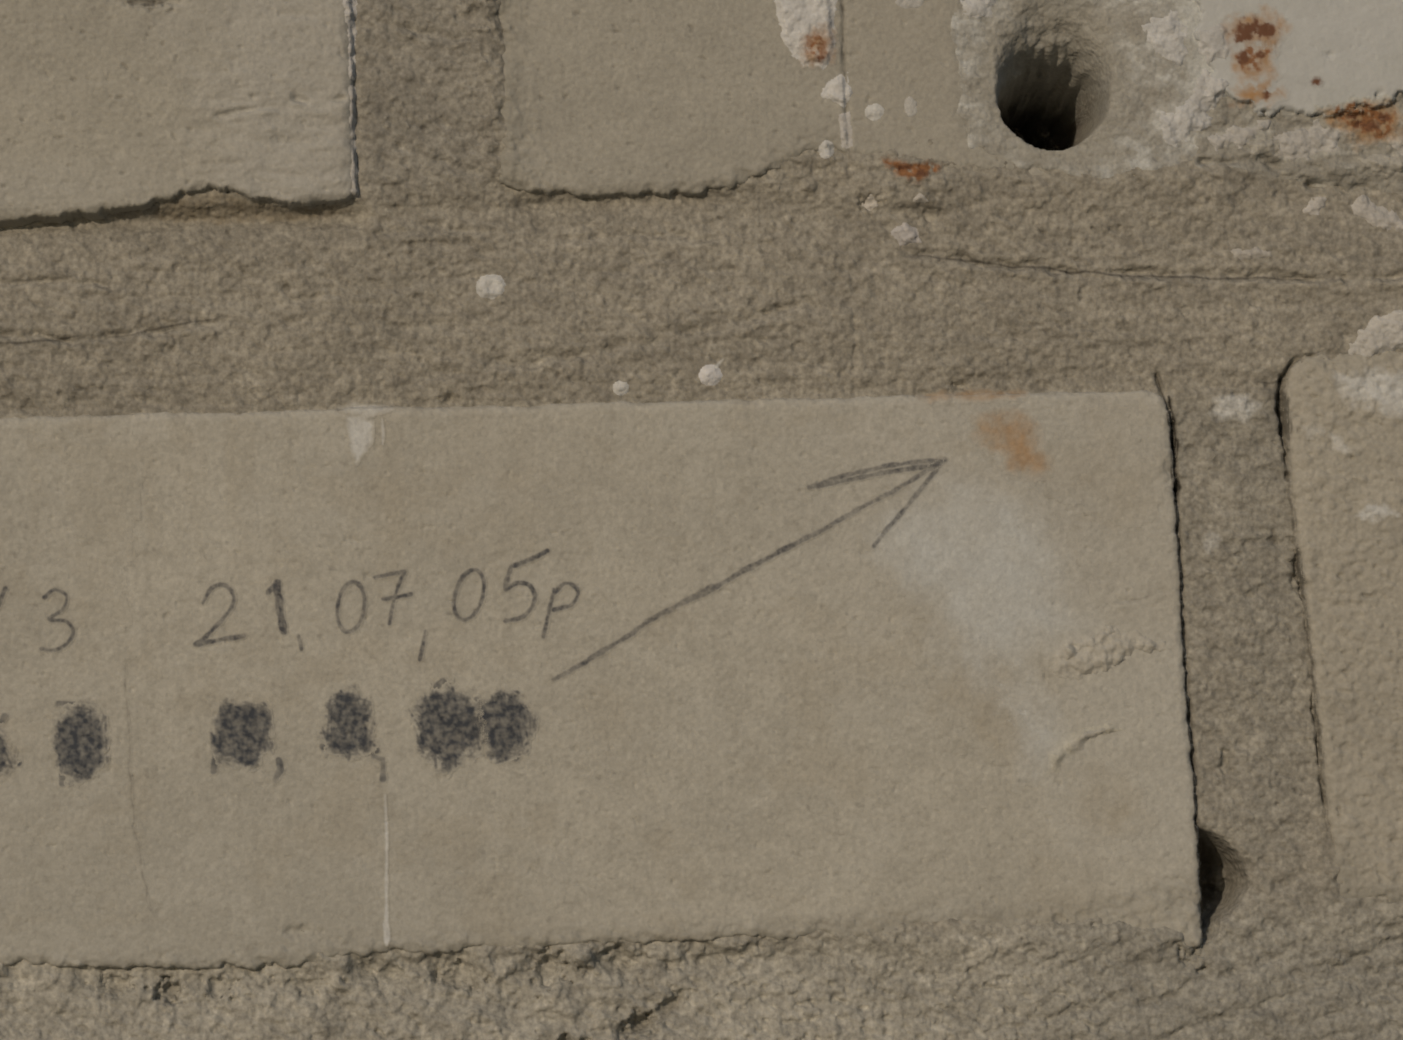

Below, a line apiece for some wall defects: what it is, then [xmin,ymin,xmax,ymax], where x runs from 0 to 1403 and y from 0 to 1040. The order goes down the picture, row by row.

rust [797,21,839,70]
spalling [950,0,1403,215]
rust [1220,2,1295,112]
rust [1309,75,1403,155]
crack [1255,347,1329,832]